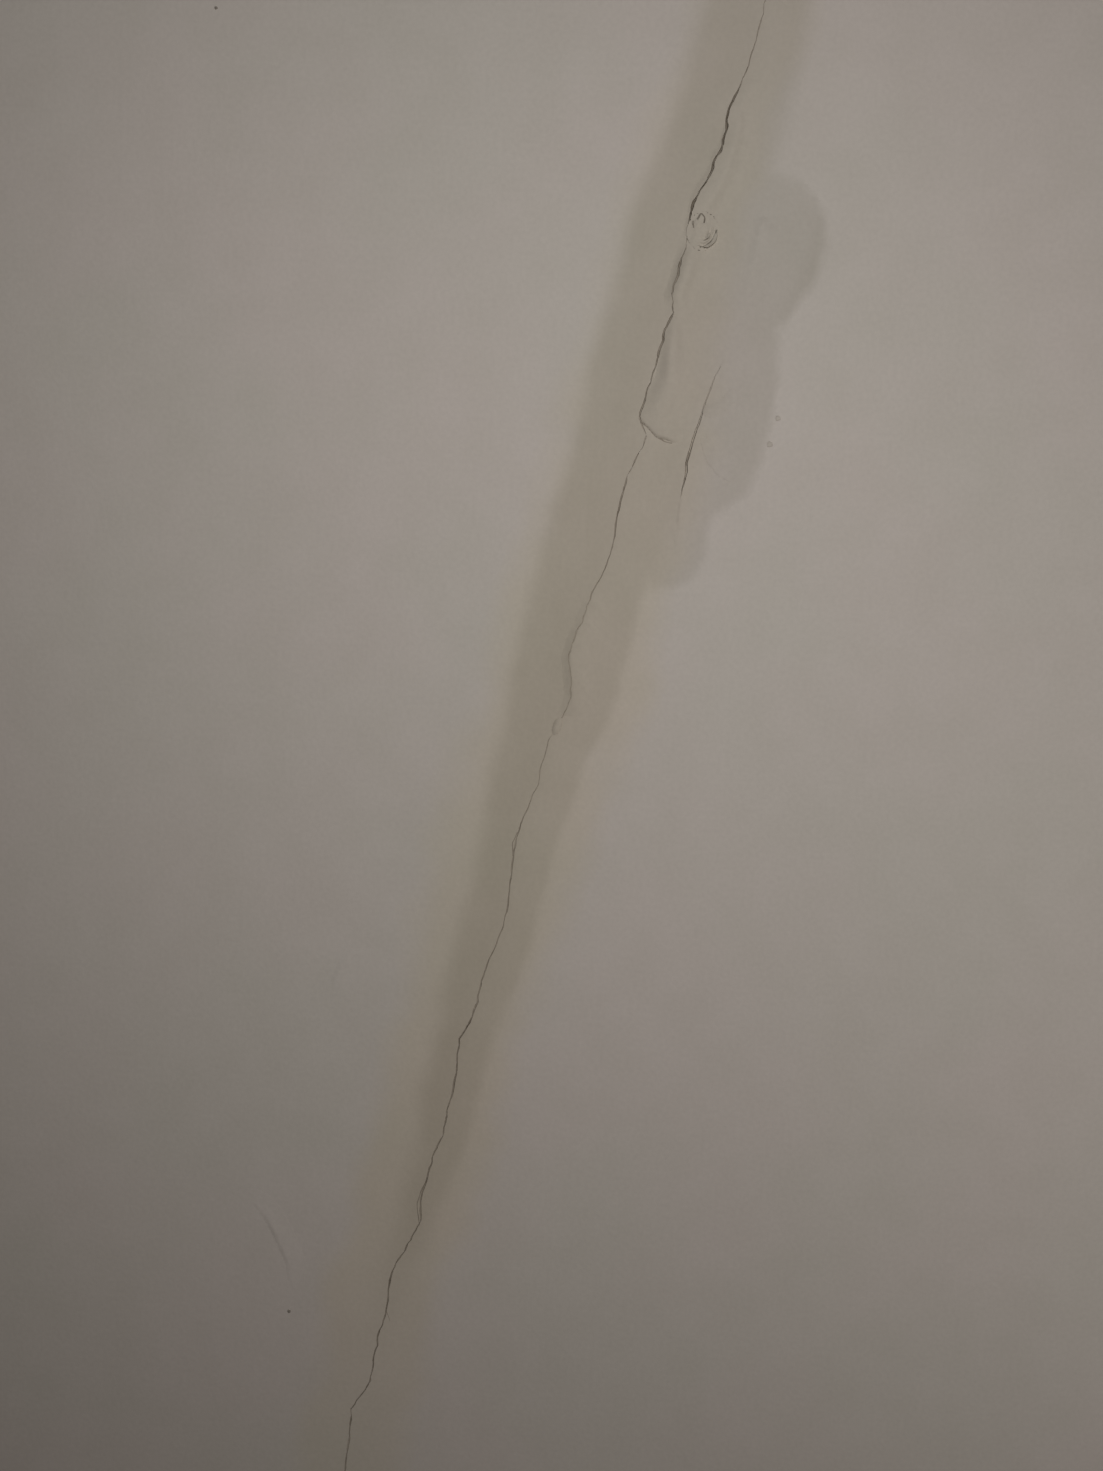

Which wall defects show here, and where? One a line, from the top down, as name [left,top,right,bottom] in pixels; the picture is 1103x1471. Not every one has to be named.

crack [344,0,766,1471]